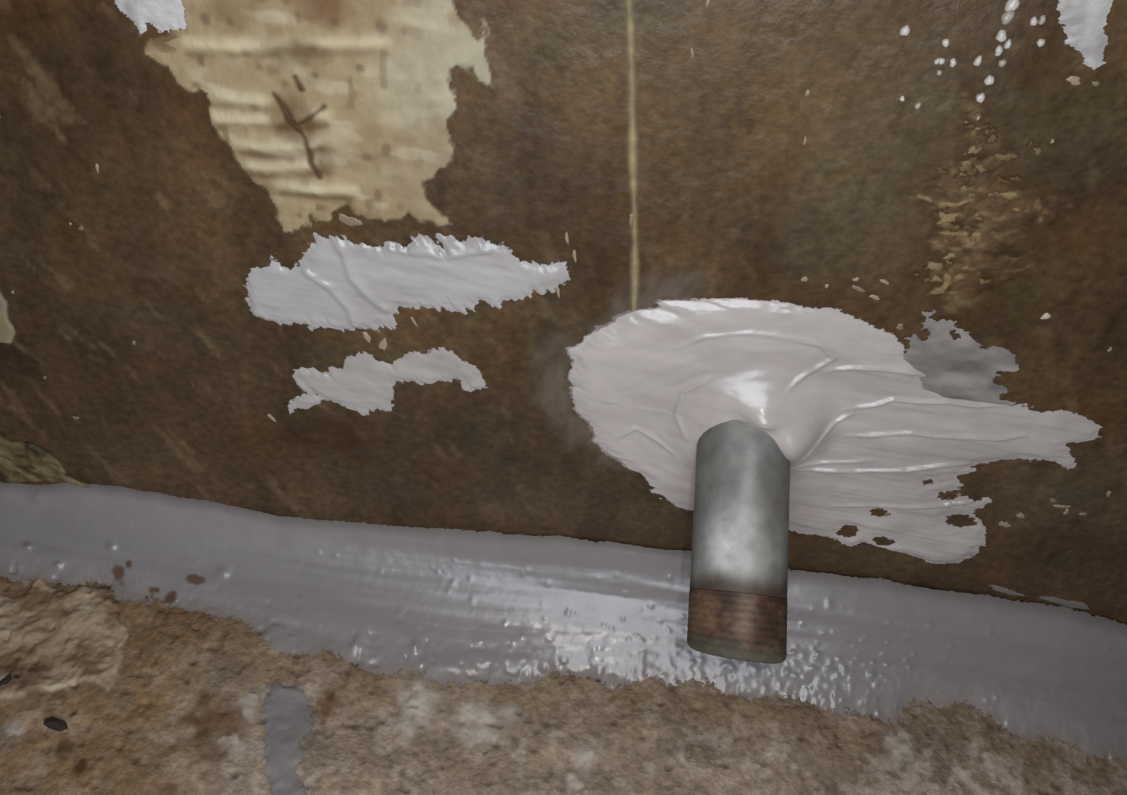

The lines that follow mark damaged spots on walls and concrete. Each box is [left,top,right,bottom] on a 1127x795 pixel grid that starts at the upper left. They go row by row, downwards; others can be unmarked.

peeling [145,0,491,232]